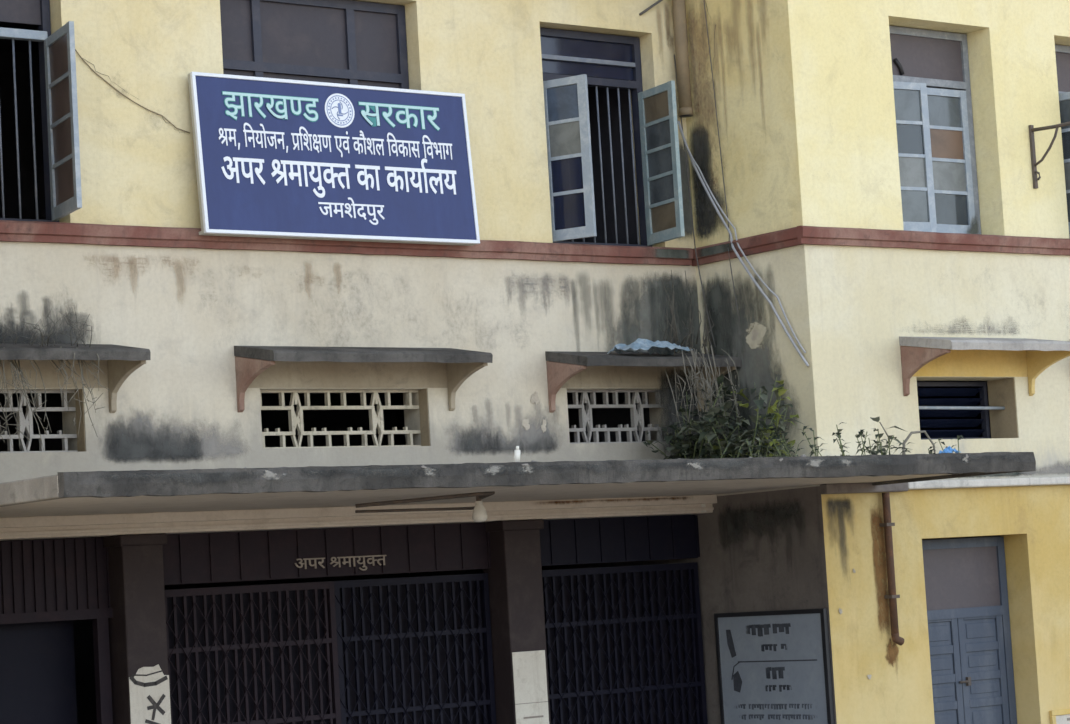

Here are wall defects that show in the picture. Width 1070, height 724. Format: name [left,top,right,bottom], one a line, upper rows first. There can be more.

damp [679,13,724,238]
flaking render [745,322,767,349]
damp [614,277,796,470]
damp [795,458,892,467]
damp [721,501,802,546]
damp [828,500,850,513]
rust [871,510,899,665]